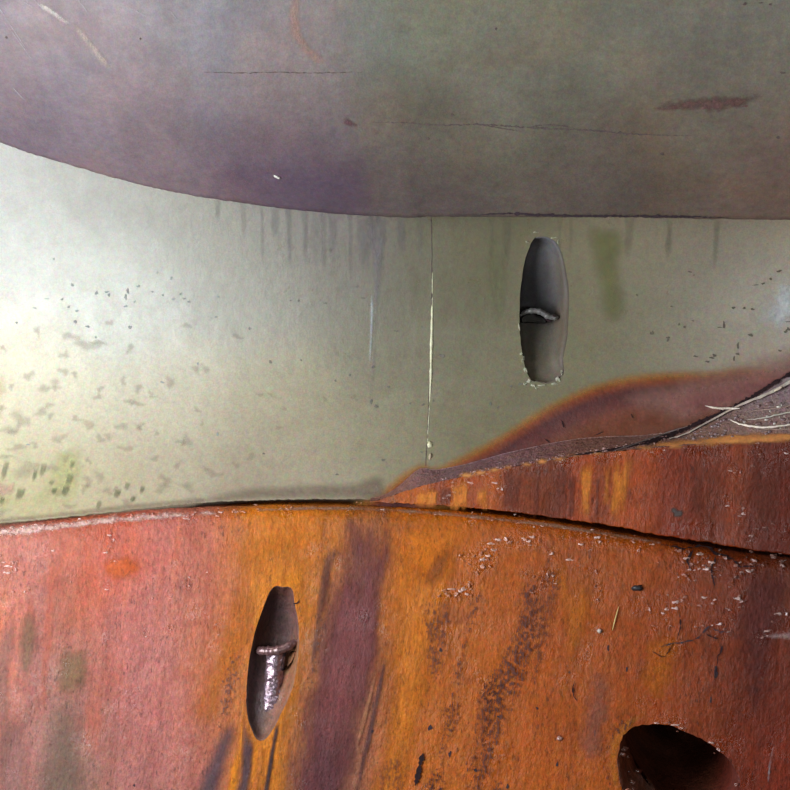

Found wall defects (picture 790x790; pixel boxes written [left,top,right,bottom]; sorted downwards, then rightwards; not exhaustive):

crack [423,367,431,466]
spalling [520,352,563,389]
corrosion [361,362,790,511]
damp [0,501,197,534]
corrosion [210,545,305,709]
corrosion [376,525,466,790]
corrosion [228,681,295,790]
corrosion [610,720,633,788]